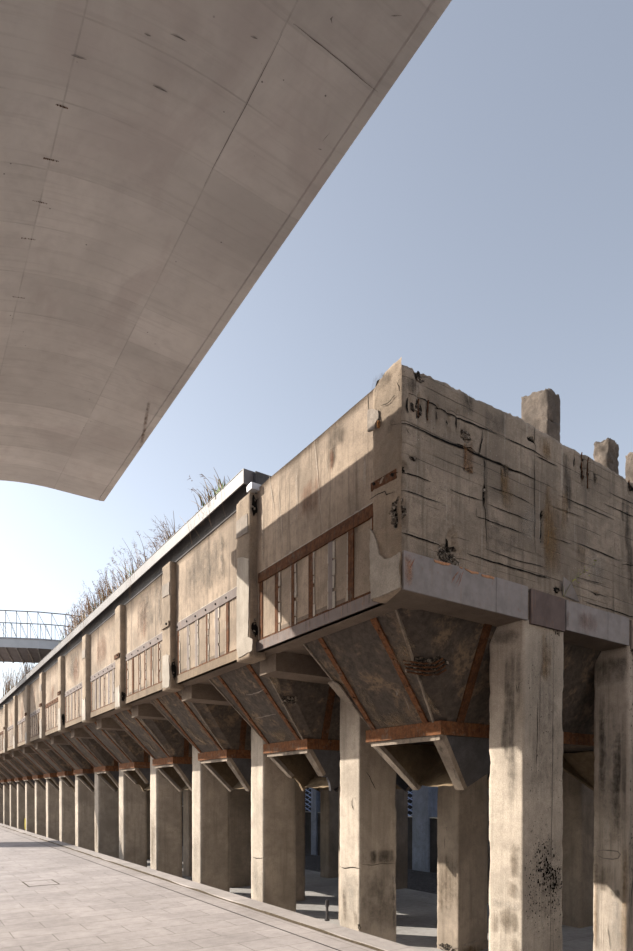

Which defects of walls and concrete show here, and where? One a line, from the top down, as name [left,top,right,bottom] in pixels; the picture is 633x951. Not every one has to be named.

spalling [406,398,471,441]
crack [368,383,633,579]
spalling [389,496,407,530]
spalling [434,539,495,579]
crack [578,577,633,617]